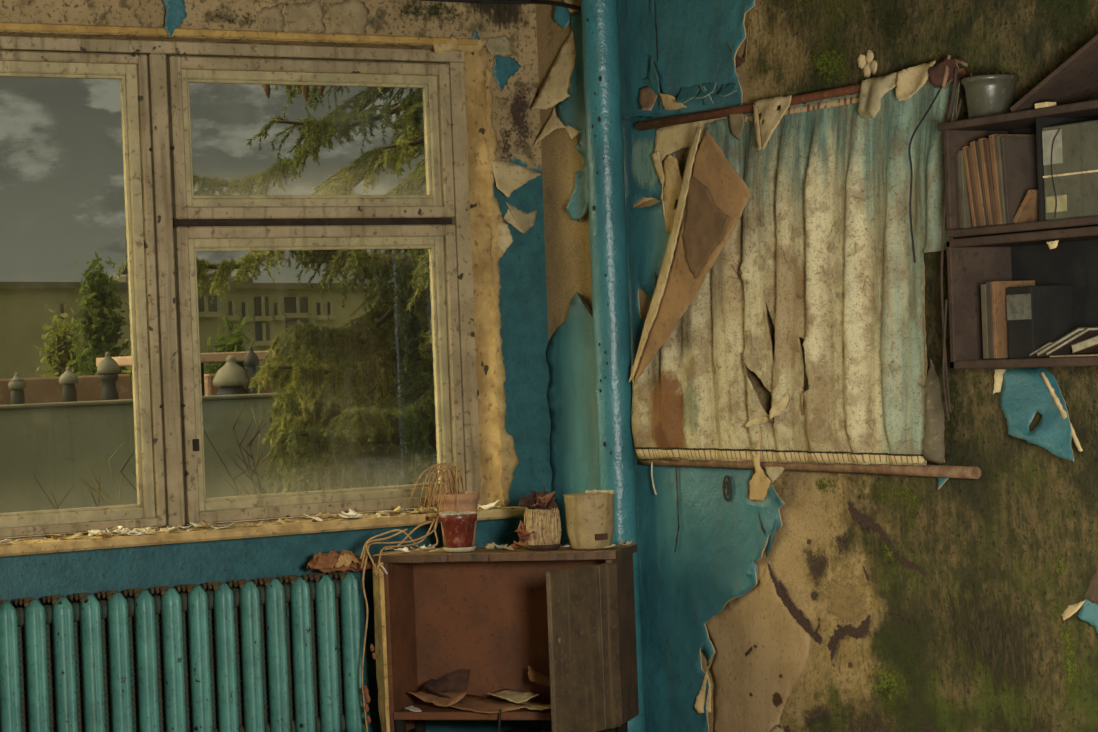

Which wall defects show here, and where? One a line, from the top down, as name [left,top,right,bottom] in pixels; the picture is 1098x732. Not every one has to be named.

water stain [400,1,528,29]
peeling [531,0,604,222]
peeling [856,50,877,79]
peeling [491,159,541,253]
crack [847,501,926,582]
peeling [635,452,811,732]
crack [768,564,908,667]
water stain [772,692,782,707]